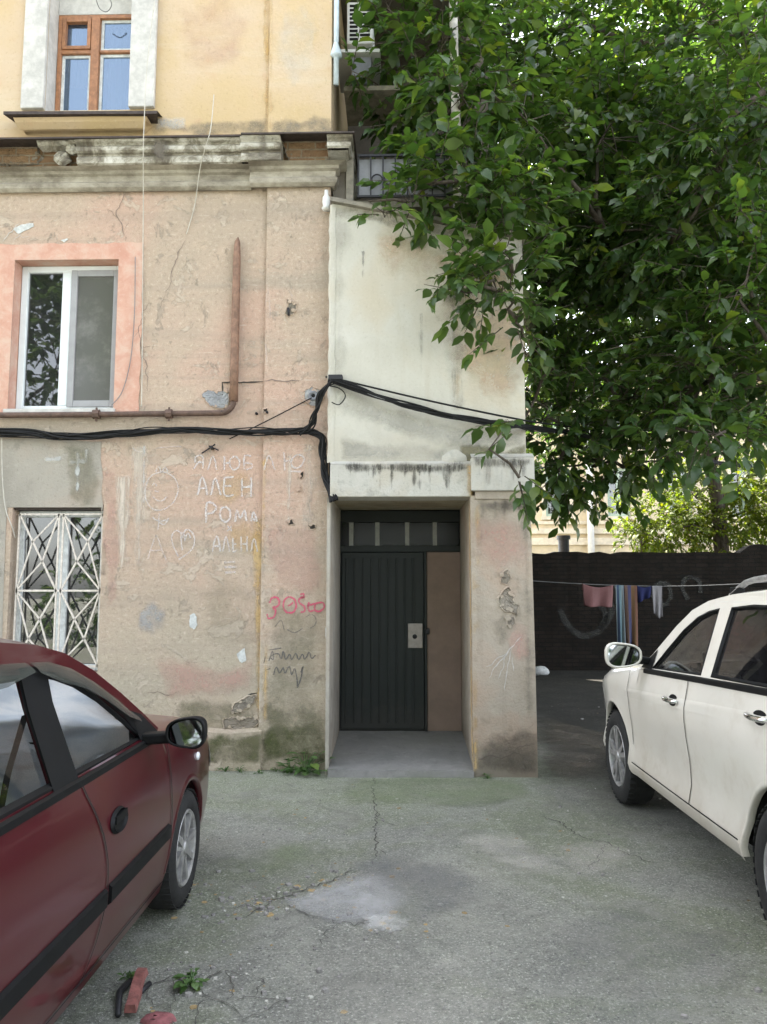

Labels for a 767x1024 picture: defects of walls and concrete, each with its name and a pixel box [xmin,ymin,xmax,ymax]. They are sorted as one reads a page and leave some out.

leakage [344,444,463,486]
spalling [497,569,521,629]
flaking render [222,694,259,730]